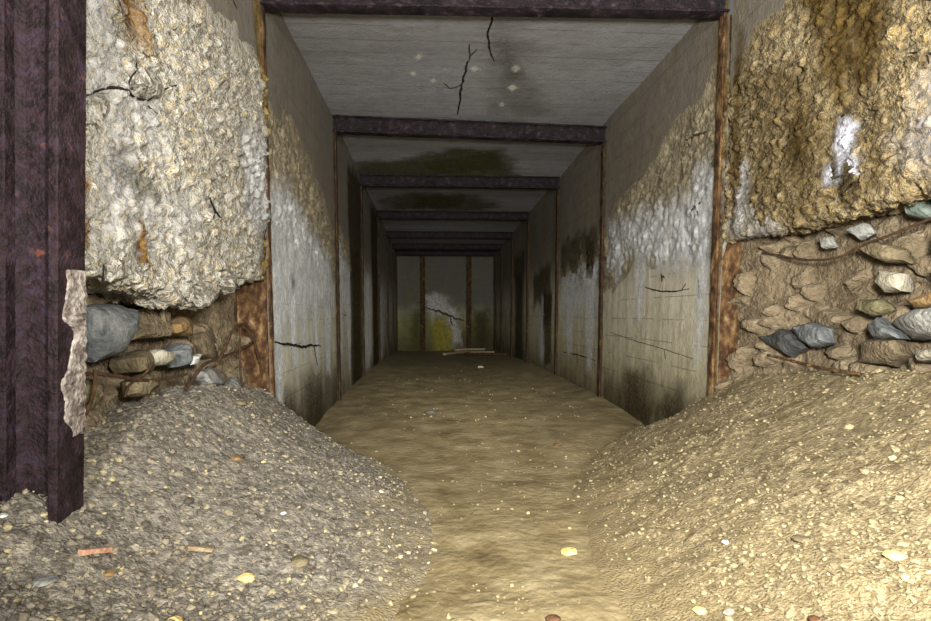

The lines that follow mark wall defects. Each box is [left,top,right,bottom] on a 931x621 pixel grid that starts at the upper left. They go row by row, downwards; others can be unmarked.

crack [86,63,177,114]
spalling [85,0,270,312]
crack [443,17,494,115]
spalling [722,0,931,244]
crack [275,341,321,365]
water stain [242,131,518,403]
crack [426,307,464,326]
water stain [534,168,714,367]